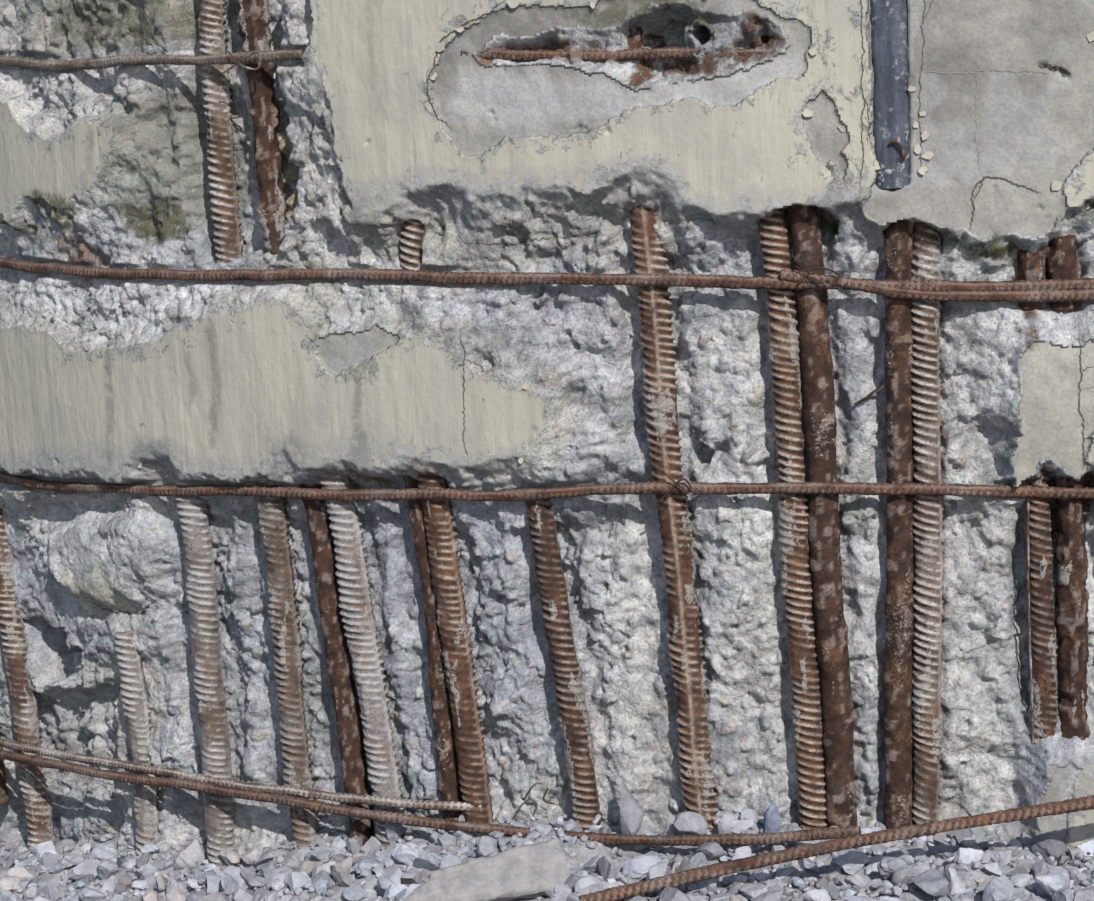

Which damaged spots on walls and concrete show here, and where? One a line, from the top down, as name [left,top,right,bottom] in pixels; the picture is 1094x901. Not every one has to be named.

corrosion [479,42,615,65]
spalling [0,0,1094,282]
corrosion [627,12,784,87]
crack [918,0,1071,230]
crack [460,333,484,463]
crack [1078,341,1094,466]
spalling [0,267,1094,901]
corrosion [1025,469,1094,740]